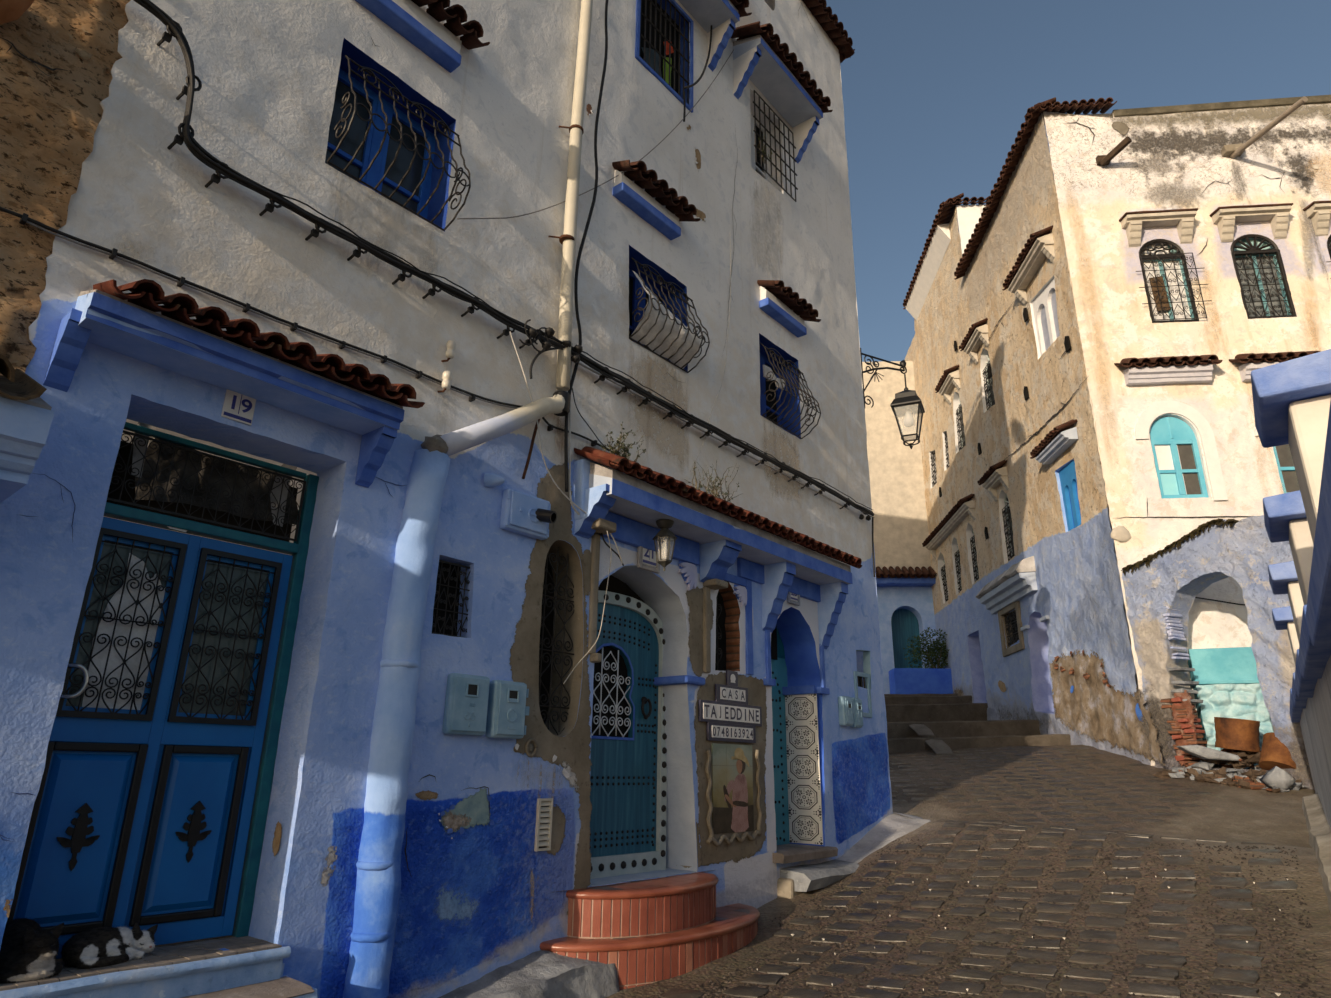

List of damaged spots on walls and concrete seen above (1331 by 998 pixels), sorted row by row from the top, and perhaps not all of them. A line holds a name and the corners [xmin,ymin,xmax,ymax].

water stain [1113,104,1331,207]
spalling [1049,649,1197,768]
peeling [272,822,282,856]
peeling [438,788,494,839]